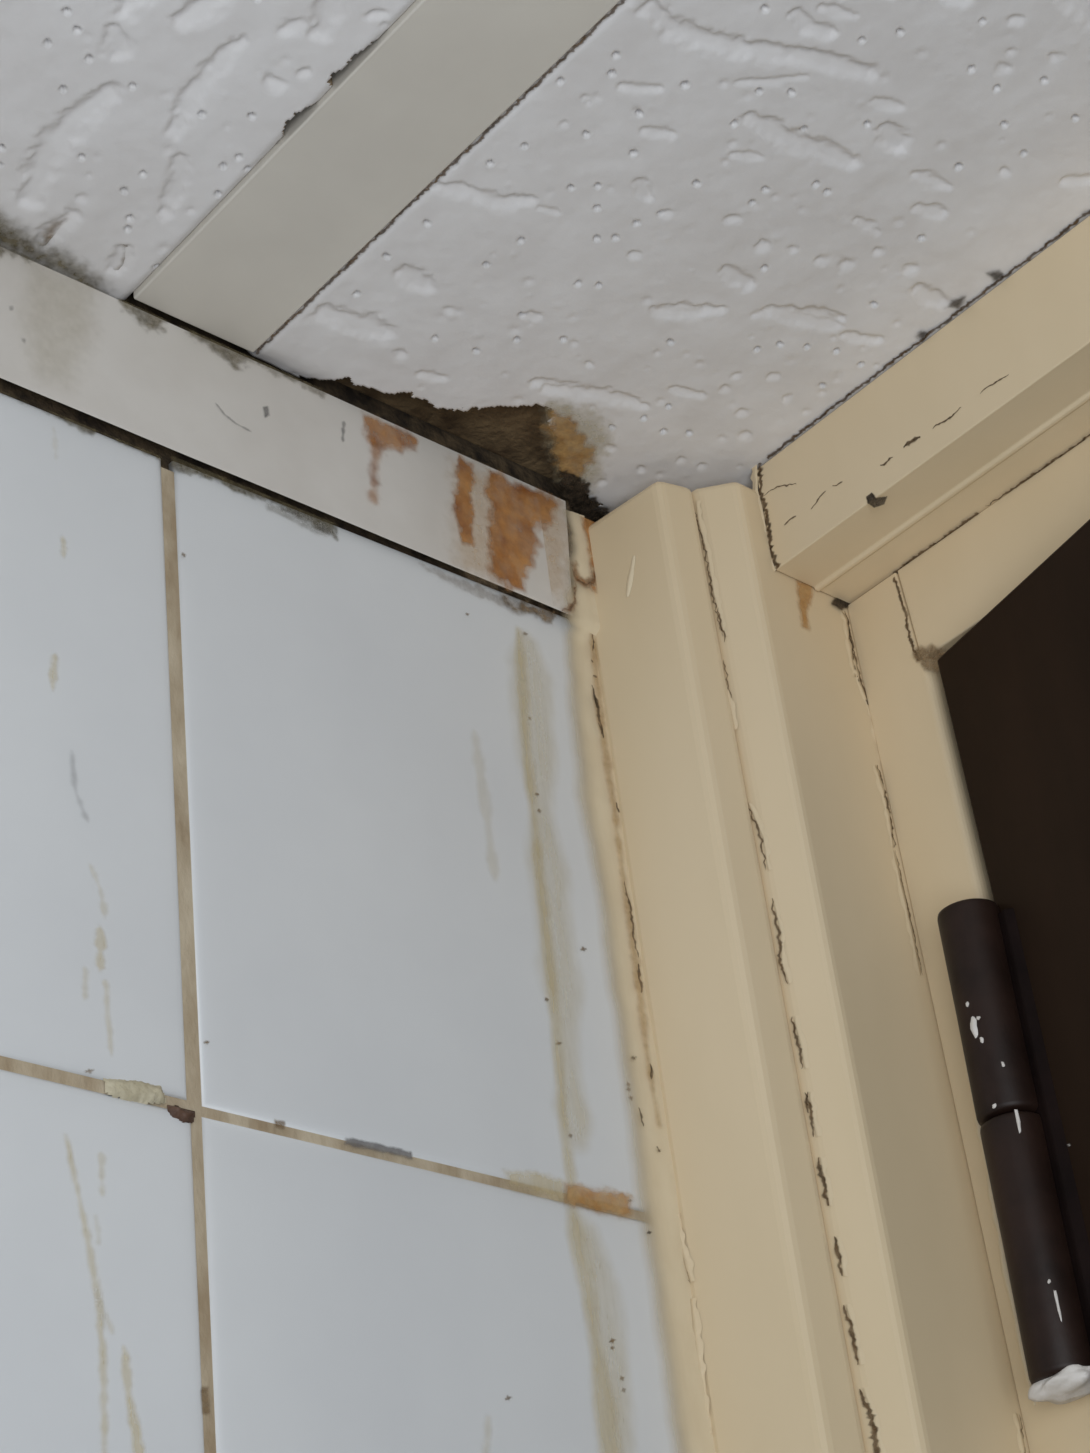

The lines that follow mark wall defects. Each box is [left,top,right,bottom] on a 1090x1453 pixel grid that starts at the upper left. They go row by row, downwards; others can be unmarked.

mould [0,221,97,288]
mould [190,331,311,386]
corrosion [365,417,417,448]
spalling [336,377,563,482]
crack [880,374,1009,466]
corrosion [455,456,556,589]
crack [751,463,843,571]
crack [562,569,604,738]
crack [840,611,923,975]
crack [624,881,643,993]
crack [748,803,887,1453]
corrosion [567,1186,629,1214]